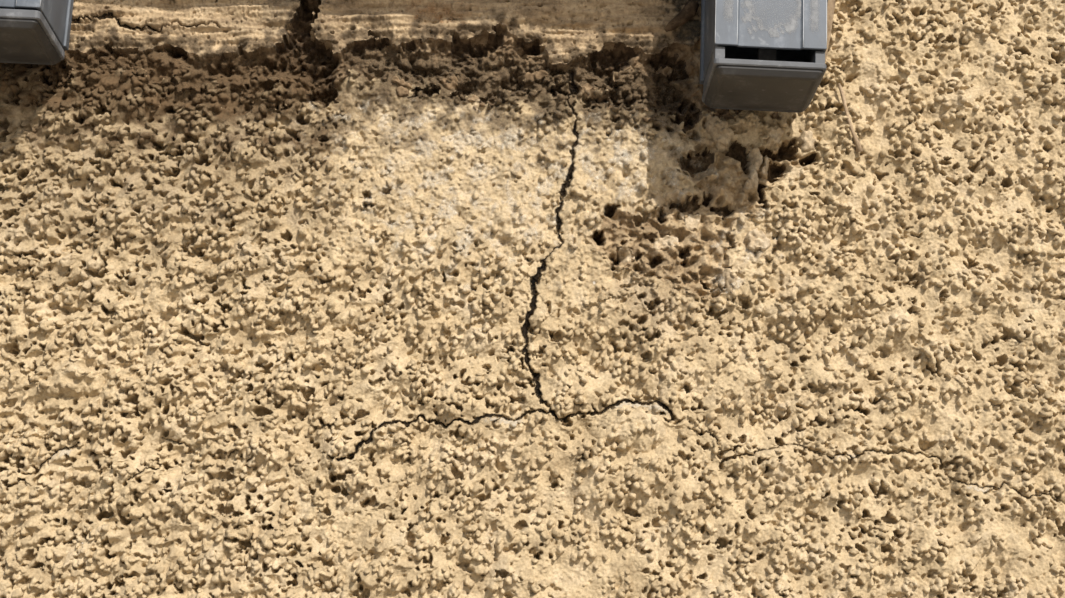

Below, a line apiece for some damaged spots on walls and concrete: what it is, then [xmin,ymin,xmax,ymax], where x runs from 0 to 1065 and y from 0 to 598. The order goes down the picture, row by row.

crack [73,0,219,32]
water stain [0,0,347,164]
water stain [311,14,686,185]
water stain [600,0,701,53]
crack [337,71,1061,501]